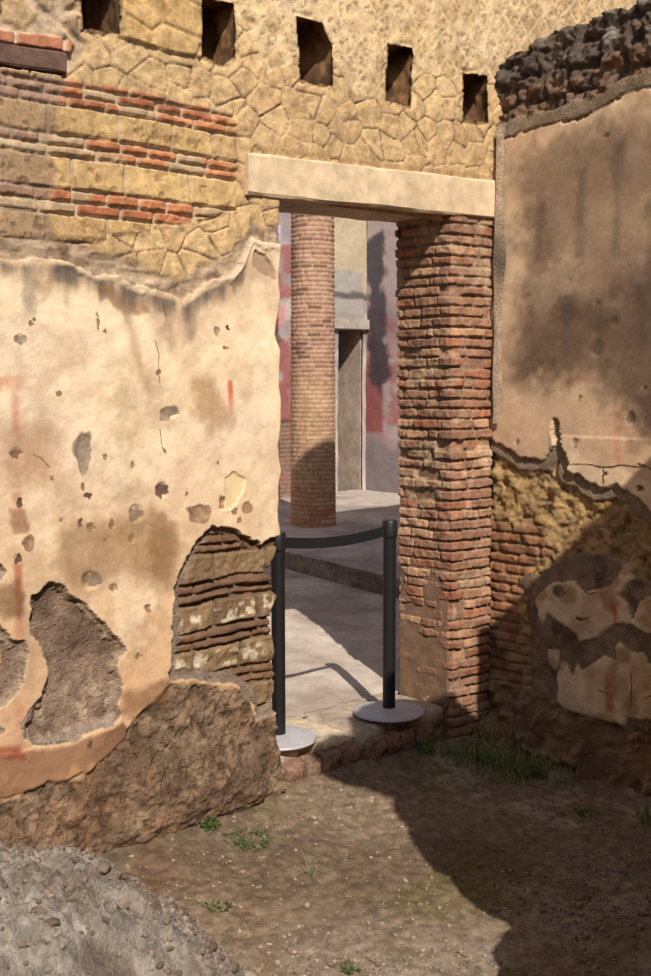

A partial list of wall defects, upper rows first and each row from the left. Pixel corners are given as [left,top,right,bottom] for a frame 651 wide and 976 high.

flaking render [253,249,277,280]
spalling [73,432,92,499]
spalling [491,418,651,525]
crack [577,463,651,484]
spalling [0,534,34,580]
spalling [83,571,118,591]
spalling [168,471,278,720]
flaking render [535,562,651,641]
spalling [0,581,142,749]
flaking render [549,642,651,726]